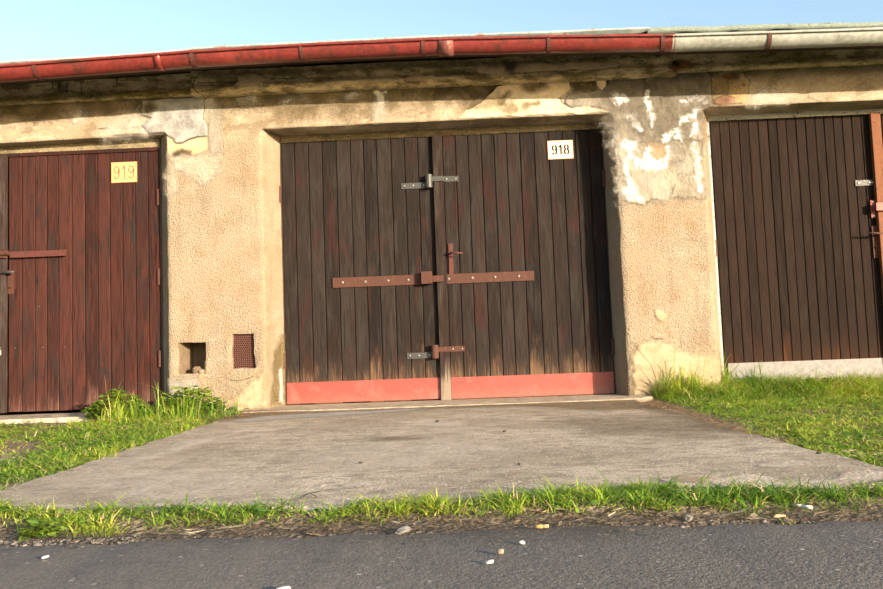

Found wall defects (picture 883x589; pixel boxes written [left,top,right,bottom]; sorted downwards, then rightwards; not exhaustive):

peeling [141,97,213,156]
water stain [223,339,681,433]